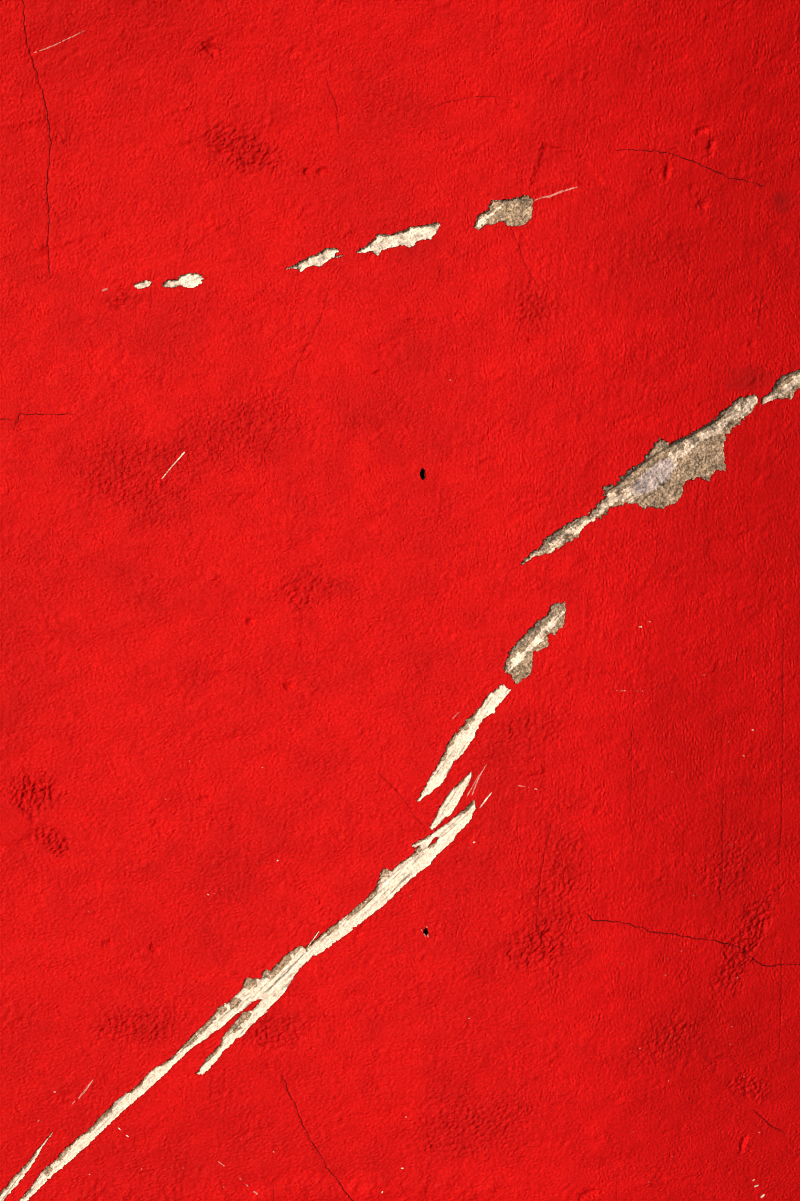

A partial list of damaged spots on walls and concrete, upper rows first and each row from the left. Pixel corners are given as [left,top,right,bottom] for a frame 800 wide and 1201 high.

peeling [134,273,203,289]
peeling [286,222,440,272]
peeling [474,195,533,230]
spalling [521,370,800,564]
peeling [161,602,566,1074]
spalling [0,1106,113,1201]